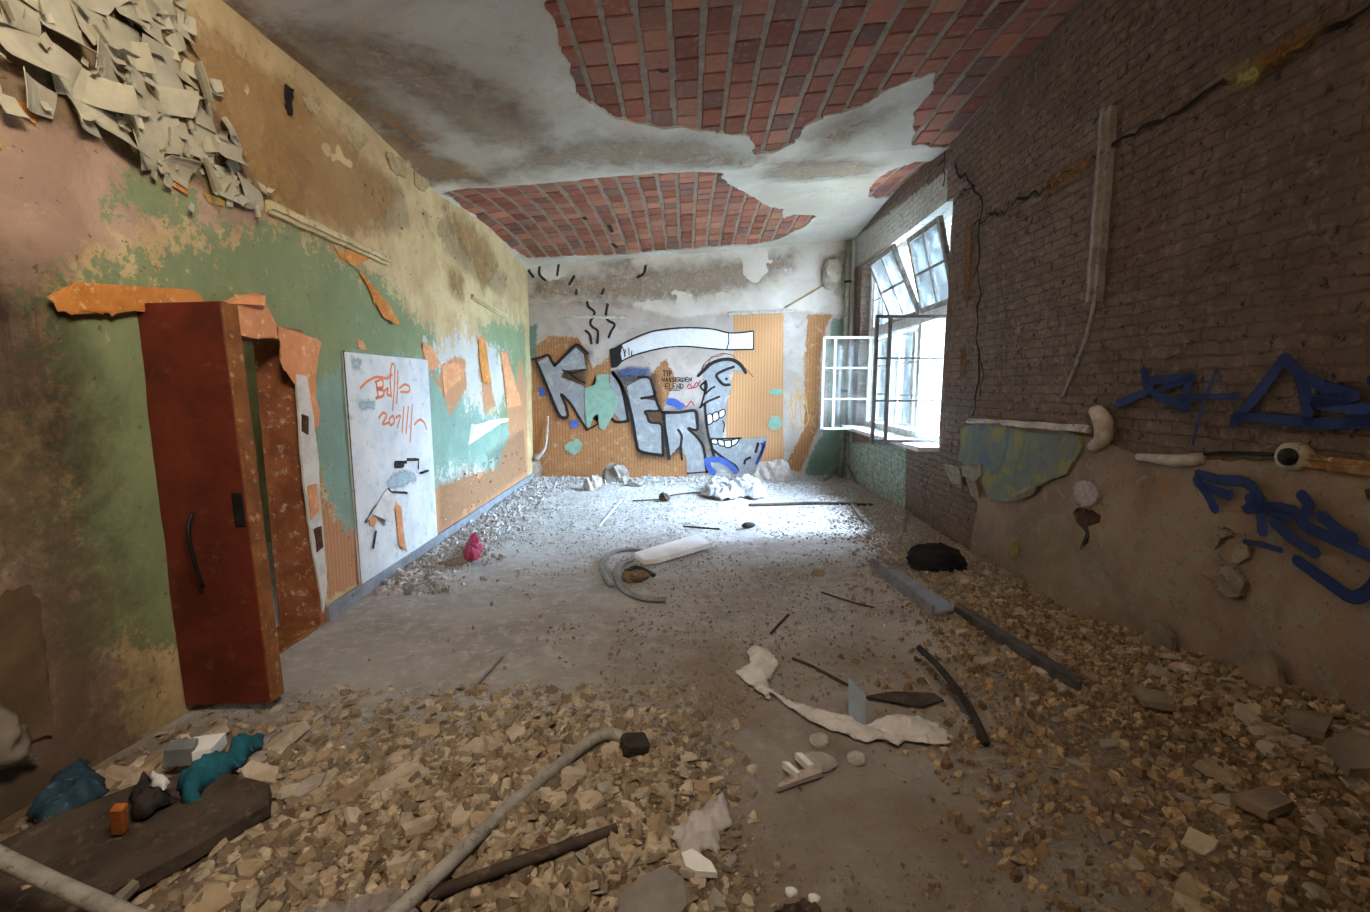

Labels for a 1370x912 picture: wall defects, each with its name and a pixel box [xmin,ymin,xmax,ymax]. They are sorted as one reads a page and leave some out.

peeling [0,0,275,218]
flaking render [284,84,322,116]
flaking render [364,151,815,258]
flaking render [544,0,1080,197]
crack [938,5,1370,417]
flaking render [944,423,1101,550]